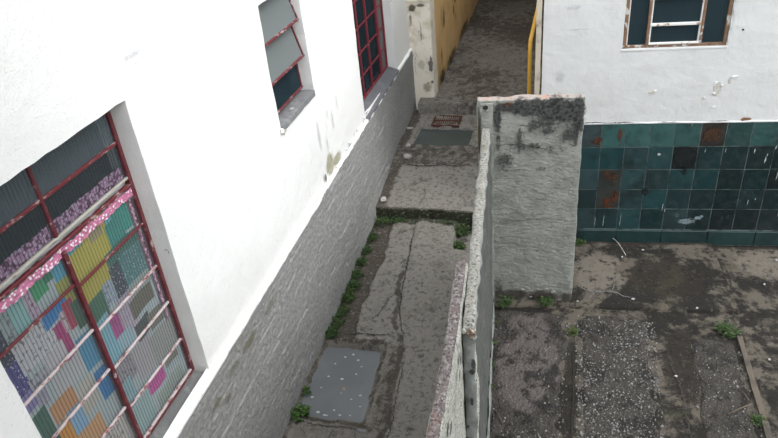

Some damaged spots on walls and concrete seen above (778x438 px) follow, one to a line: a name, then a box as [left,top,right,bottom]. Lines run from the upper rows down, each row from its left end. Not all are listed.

water stain [494,94,586,171]
crack [344,224,416,438]